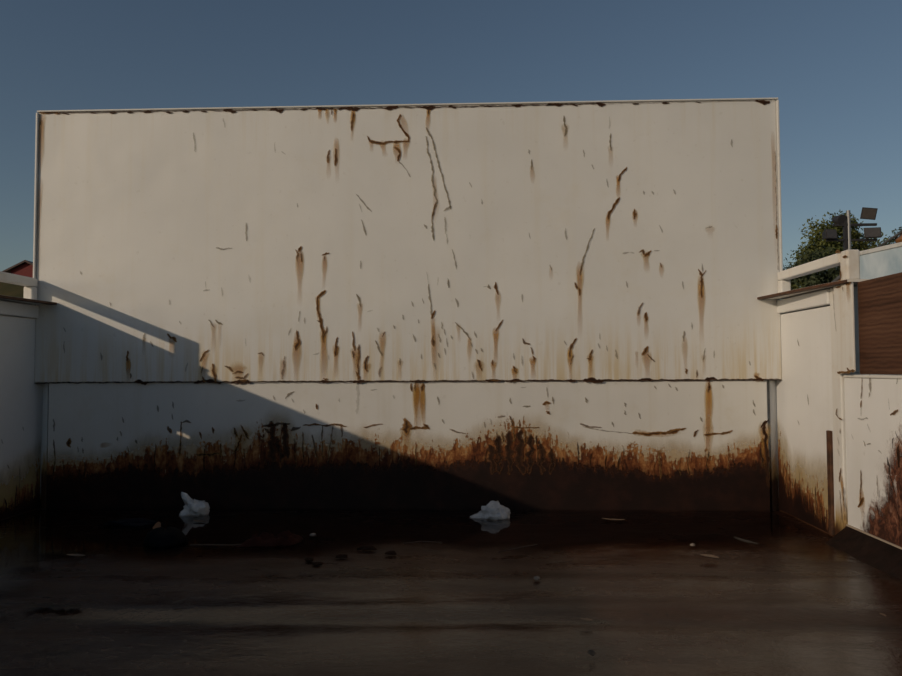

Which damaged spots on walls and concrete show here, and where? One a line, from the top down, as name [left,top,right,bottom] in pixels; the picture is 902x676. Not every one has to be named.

corrosion [606,167,627,224]
corrosion [316,290,328,354]
corrosion [194,350,250,384]
corrosion [352,332,369,383]
corrosion [567,338,577,366]
corrosion [410,380,425,410]
corrosion [705,377,717,422]
corrosion [46,417,829,533]